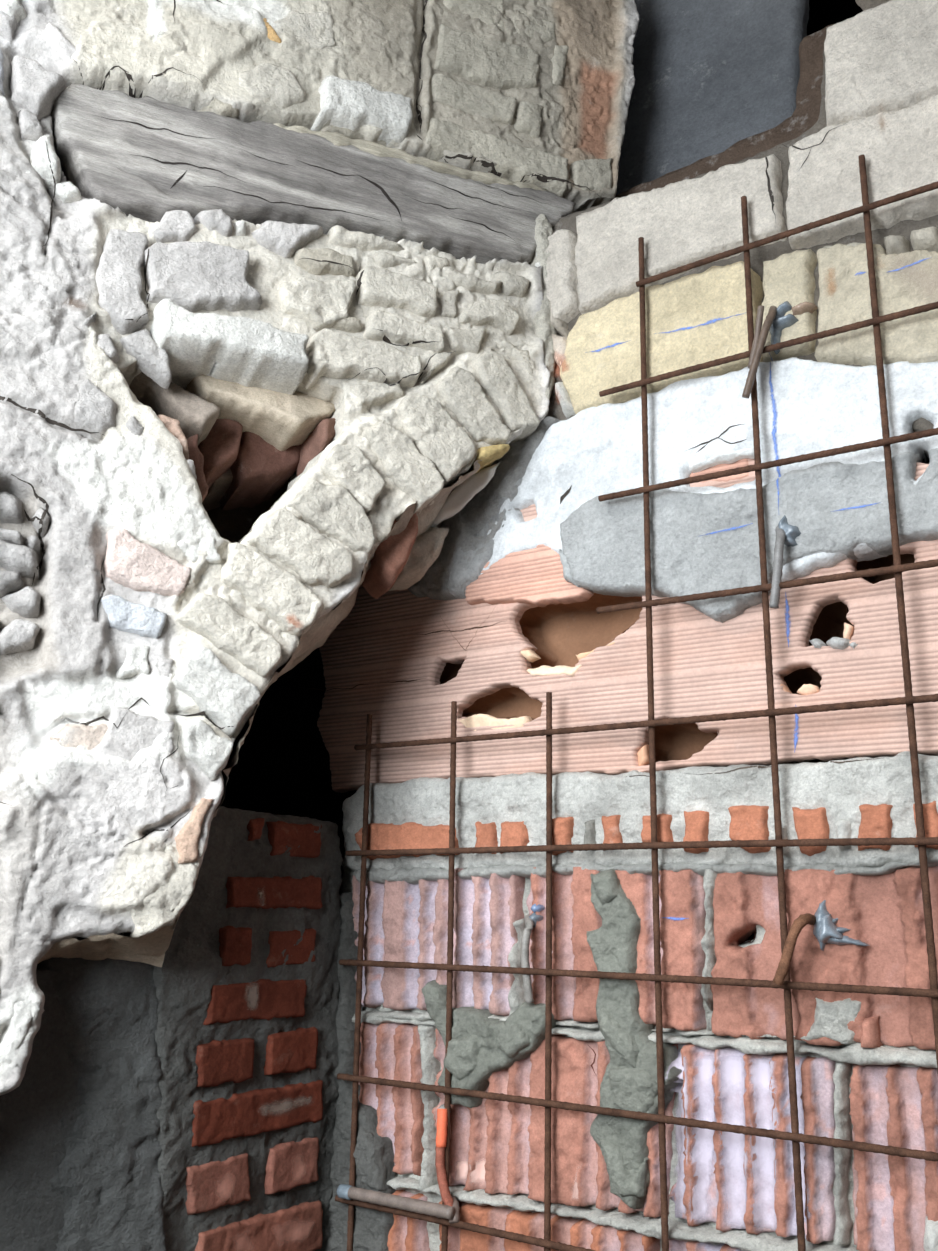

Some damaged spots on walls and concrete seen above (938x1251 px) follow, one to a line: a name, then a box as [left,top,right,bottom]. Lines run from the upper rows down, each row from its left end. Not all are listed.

crack [0,396,105,436]
spalling [129,372,336,511]
crack [686,424,746,453]
peeling [177,538,222,564]
spalling [335,154,938,1251]
peeling [96,706,175,773]